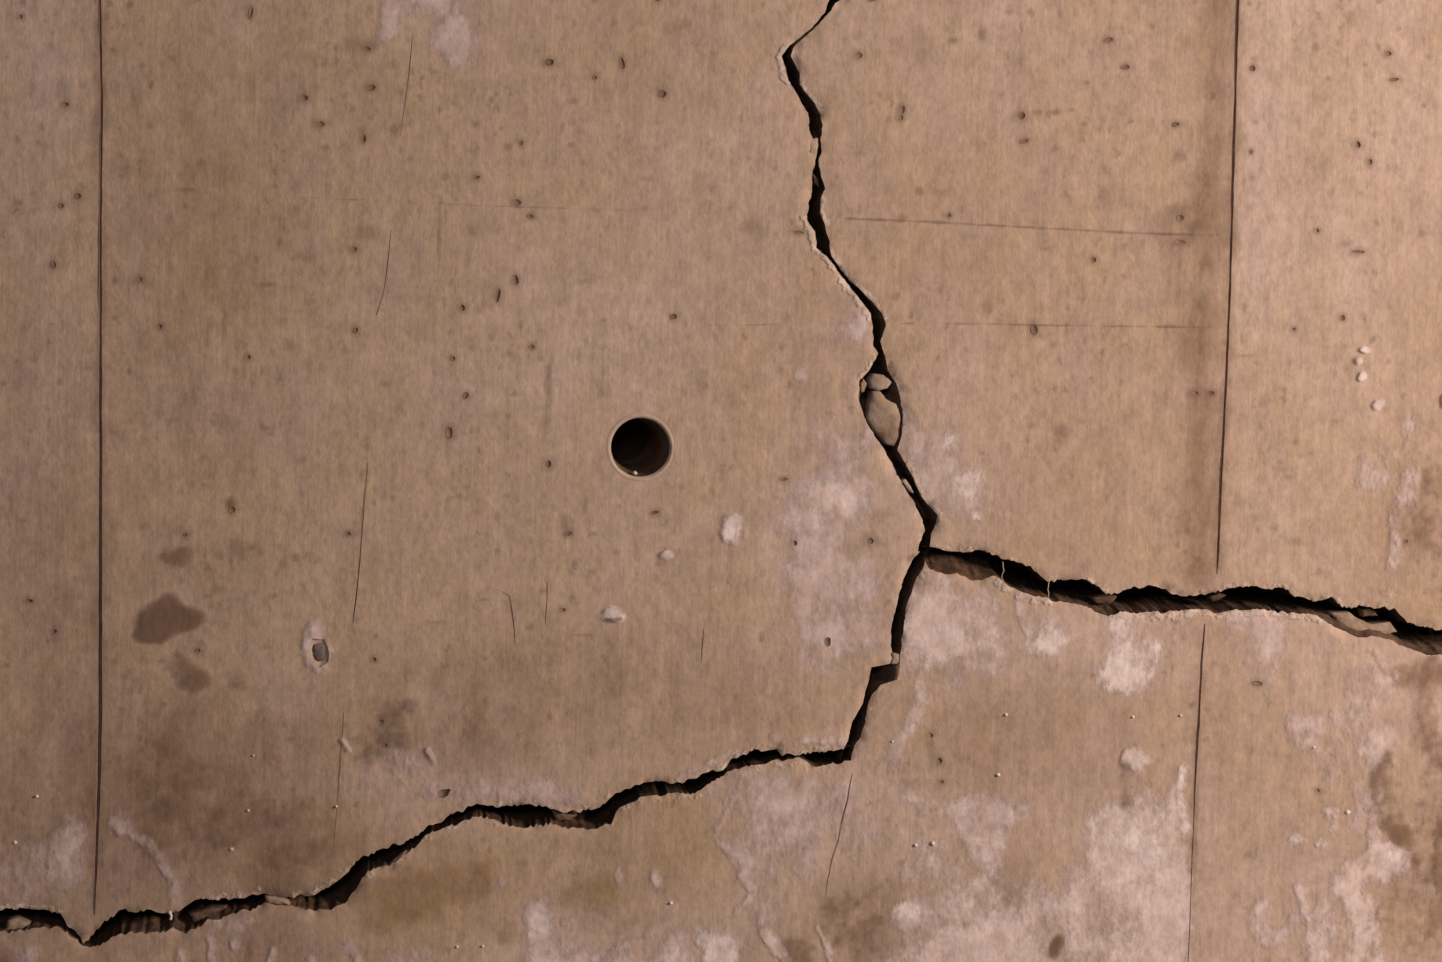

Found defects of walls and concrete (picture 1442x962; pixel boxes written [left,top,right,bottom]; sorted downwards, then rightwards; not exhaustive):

crack [400,34,413,136]
crack [377,232,391,313]
crack [777,0,943,551]
damp [135,595,202,642]
crack [353,466,368,621]
crack [0,546,1442,947]